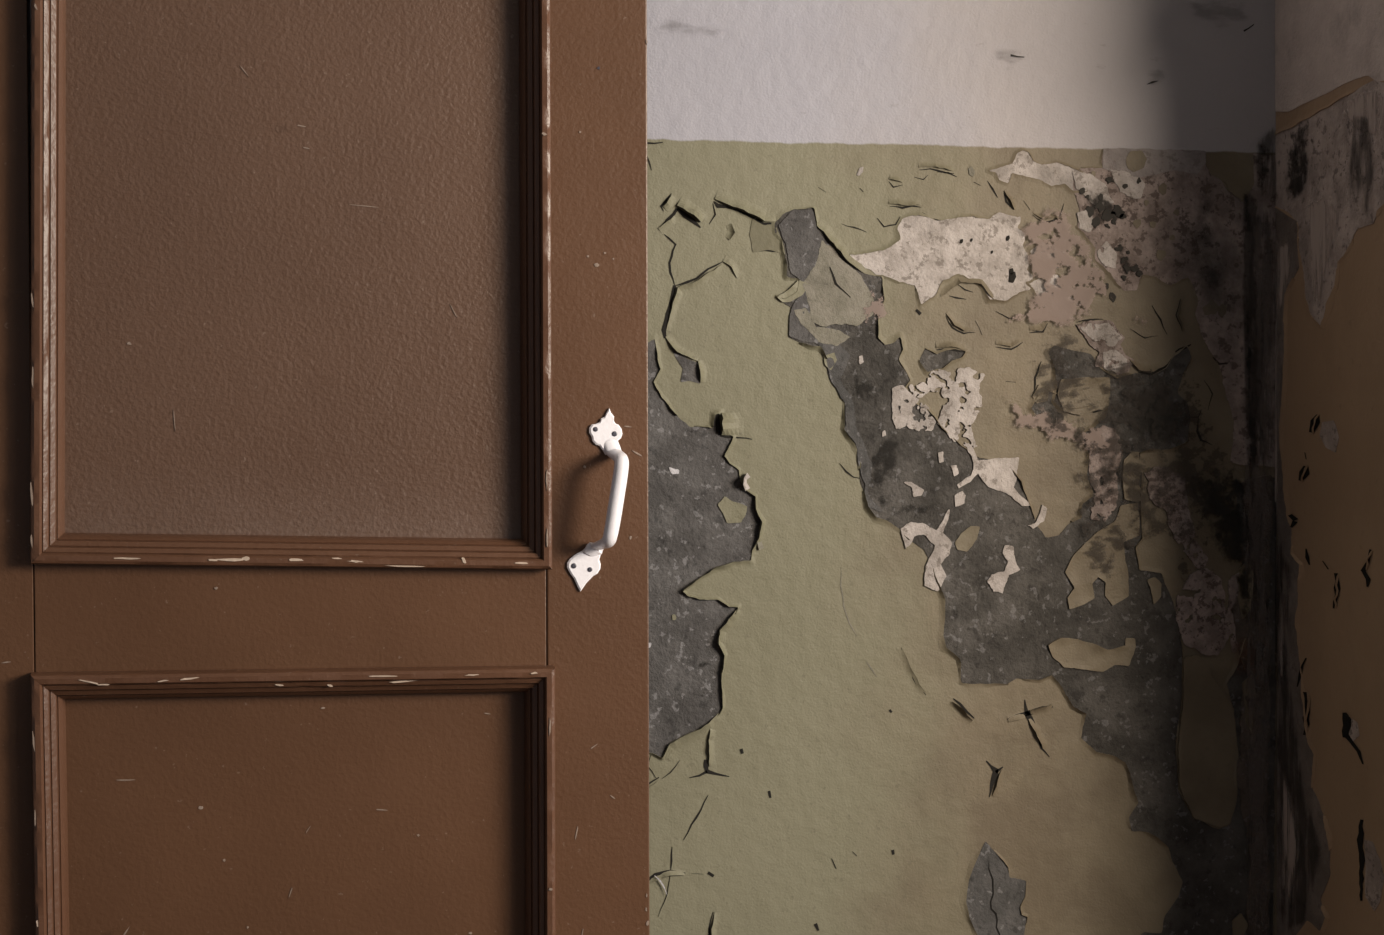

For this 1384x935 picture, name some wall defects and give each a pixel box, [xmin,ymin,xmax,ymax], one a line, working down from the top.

crack [647,142,785,338]
water stain [1105,244,1143,302]
water stain [1079,148,1206,229]
peeling [629,333,766,762]
peeling [770,0,1384,935]
water stain [1194,131,1333,935]
crack [649,729,729,917]
crack [897,647,974,724]
crack [986,761,1006,797]
crack [1007,700,1053,757]